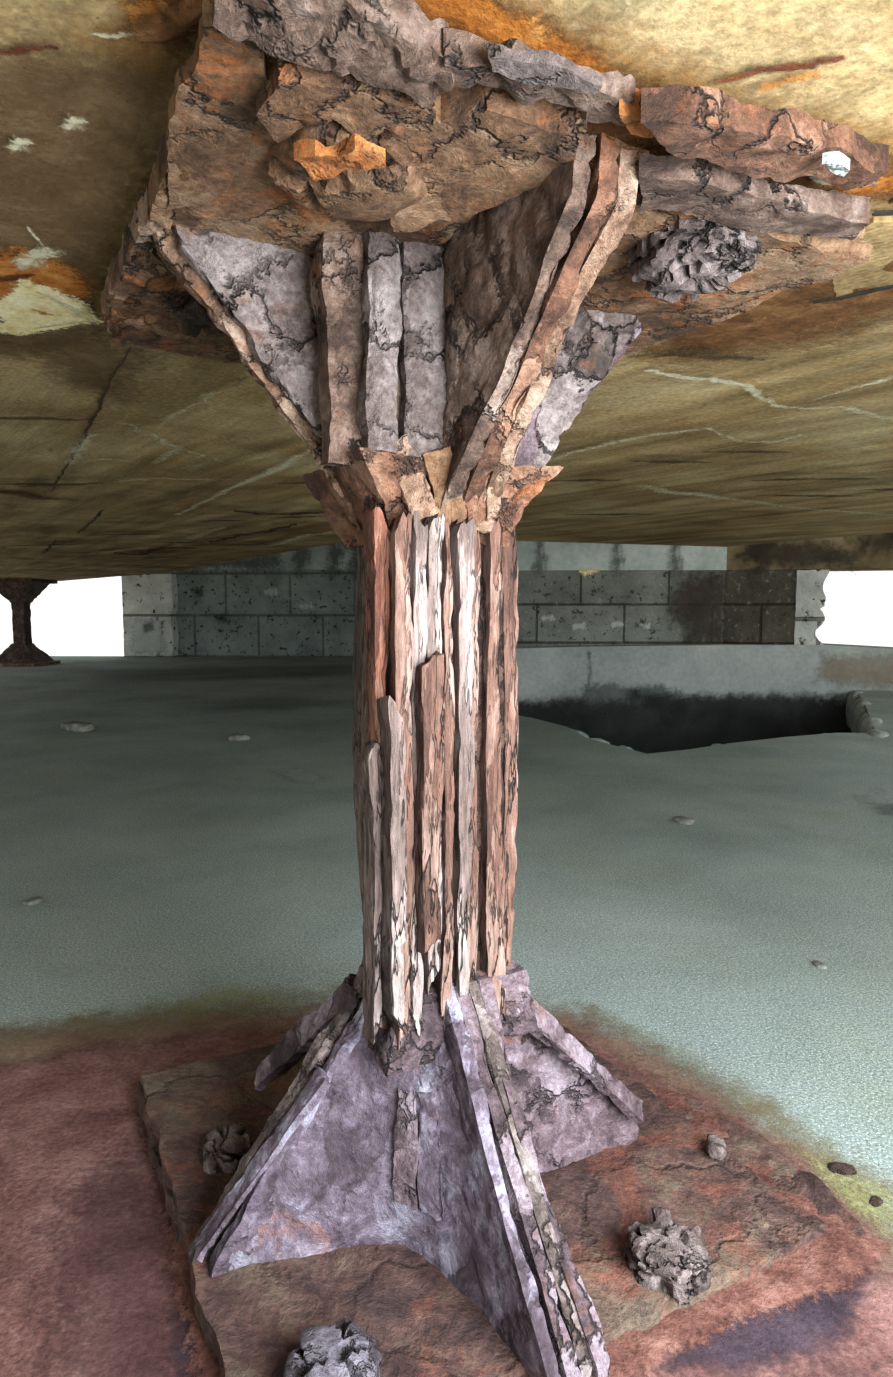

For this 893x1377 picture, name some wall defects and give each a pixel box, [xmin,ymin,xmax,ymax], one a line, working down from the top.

rust [714,55,845,93]
peeling [810,151,850,185]
crack [871,198,893,216]
spalling [0,227,104,336]
crack [813,285,893,304]
crack [51,347,132,492]
damp [627,349,893,420]
crack [43,509,335,555]
rust [94,0,700,1279]
damp [668,532,893,644]
rust [431,84,893,1377]
rust [0,974,357,1377]